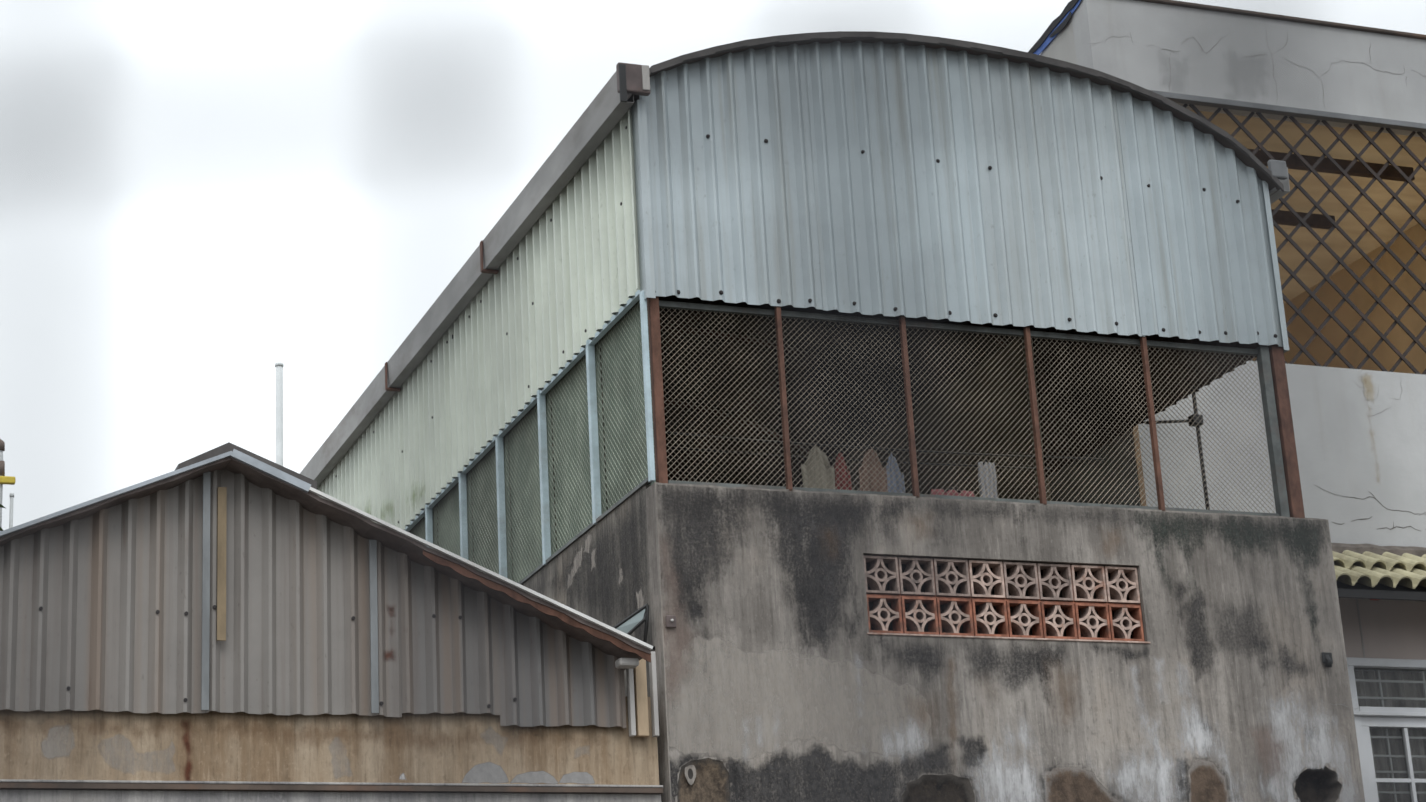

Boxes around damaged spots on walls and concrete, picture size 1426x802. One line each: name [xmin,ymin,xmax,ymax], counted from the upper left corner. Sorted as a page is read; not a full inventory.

crack [1330,491,1426,531]
water stain [552,502,644,635]
water stain [661,488,856,650]
water stain [972,642,1063,686]
water stain [726,746,873,802]
water stain [915,722,1039,802]
spalling [1294,768,1319,802]